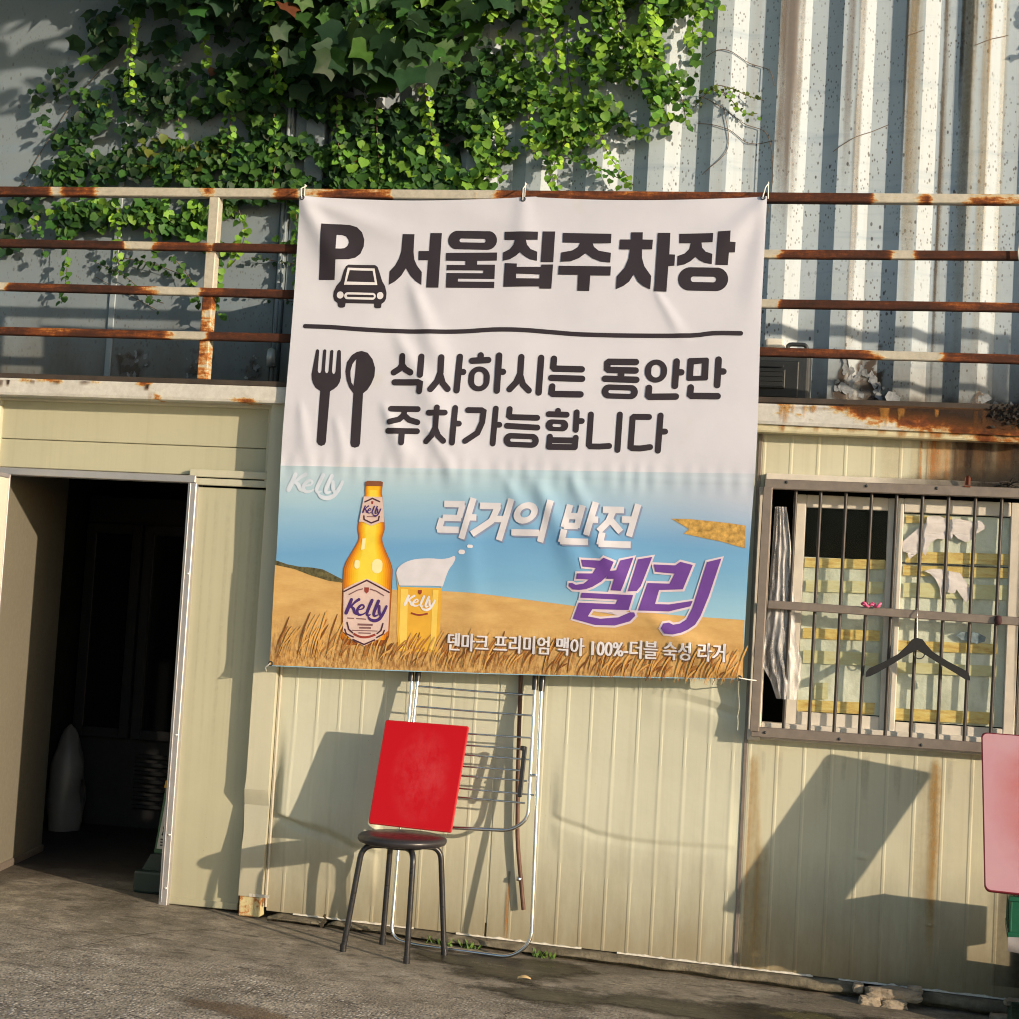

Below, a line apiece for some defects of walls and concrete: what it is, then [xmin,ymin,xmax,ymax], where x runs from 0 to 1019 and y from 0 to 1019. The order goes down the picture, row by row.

peeling [833,359,901,401]
peeling [973,392,997,404]
rust [858,406,1019,480]
rust [930,764,938,908]
leakage [410,950,895,1019]